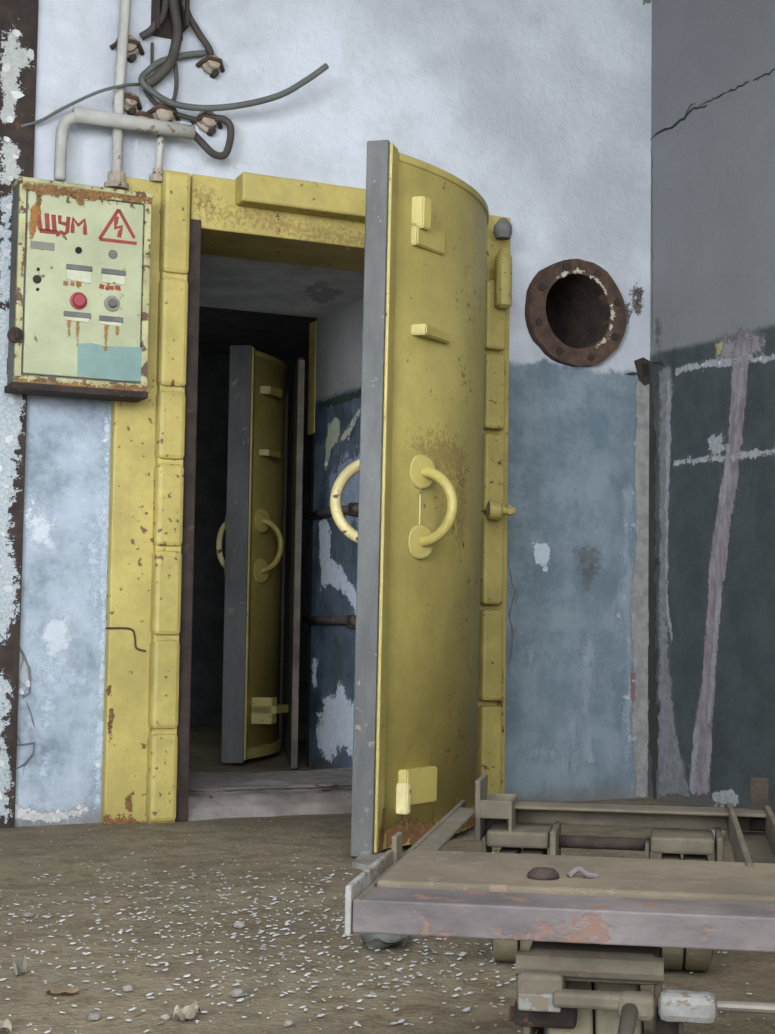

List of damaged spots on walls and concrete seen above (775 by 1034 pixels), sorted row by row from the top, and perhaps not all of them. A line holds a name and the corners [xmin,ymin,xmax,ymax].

peeling [0,26,35,123]
rust [21,182,154,277]
peeling [0,136,26,645]
peeling [324,408,361,470]
crack [648,69,775,799]
peeling [673,433,775,468]
peeling [675,353,775,376]
peeling [319,518,356,615]
flaking render [616,357,663,797]
peeling [311,657,354,768]
rust [379,801,436,850]
peeling [711,789,739,807]